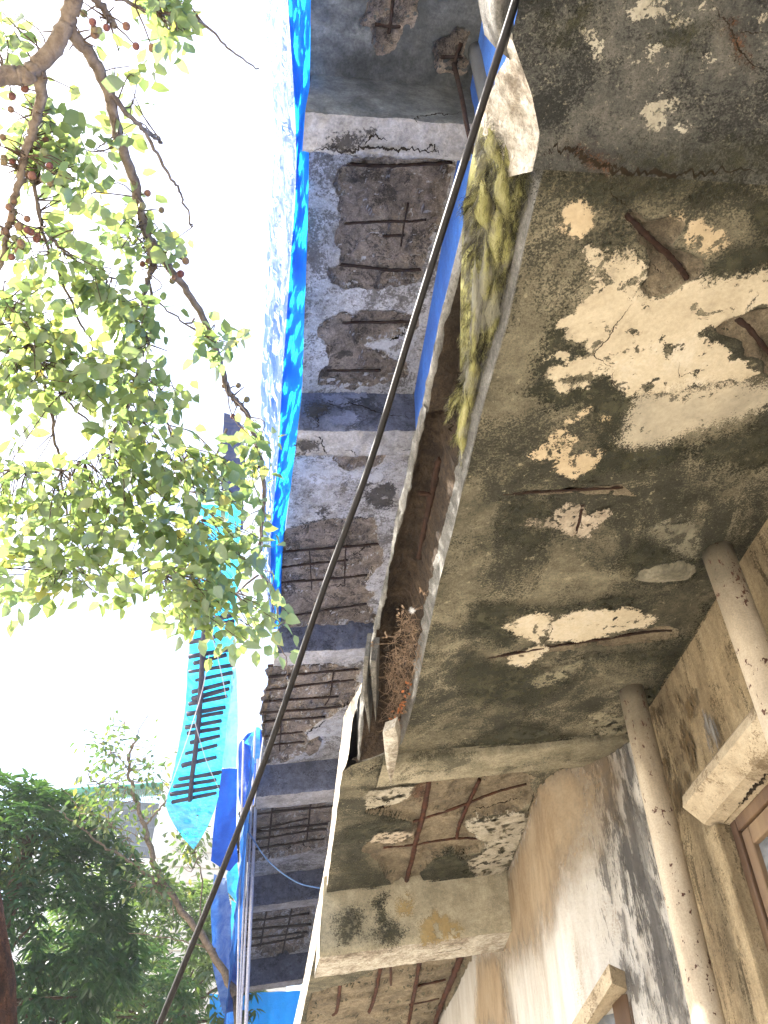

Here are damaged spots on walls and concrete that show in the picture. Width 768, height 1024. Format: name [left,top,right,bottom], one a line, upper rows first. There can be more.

crack [310,111,462,155]
crack [544,142,767,206]
spalling [259,28,545,764]
peeling [503,197,768,538]
leakage [484,491,569,554]
peeling [487,607,679,688]
leakage [448,531,720,821]
spalling [237,803,333,862]
mould [327,810,411,953]
corrosion [411,782,427,802]
spalling [306,772,536,1024]
leakage [475,743,690,1024]